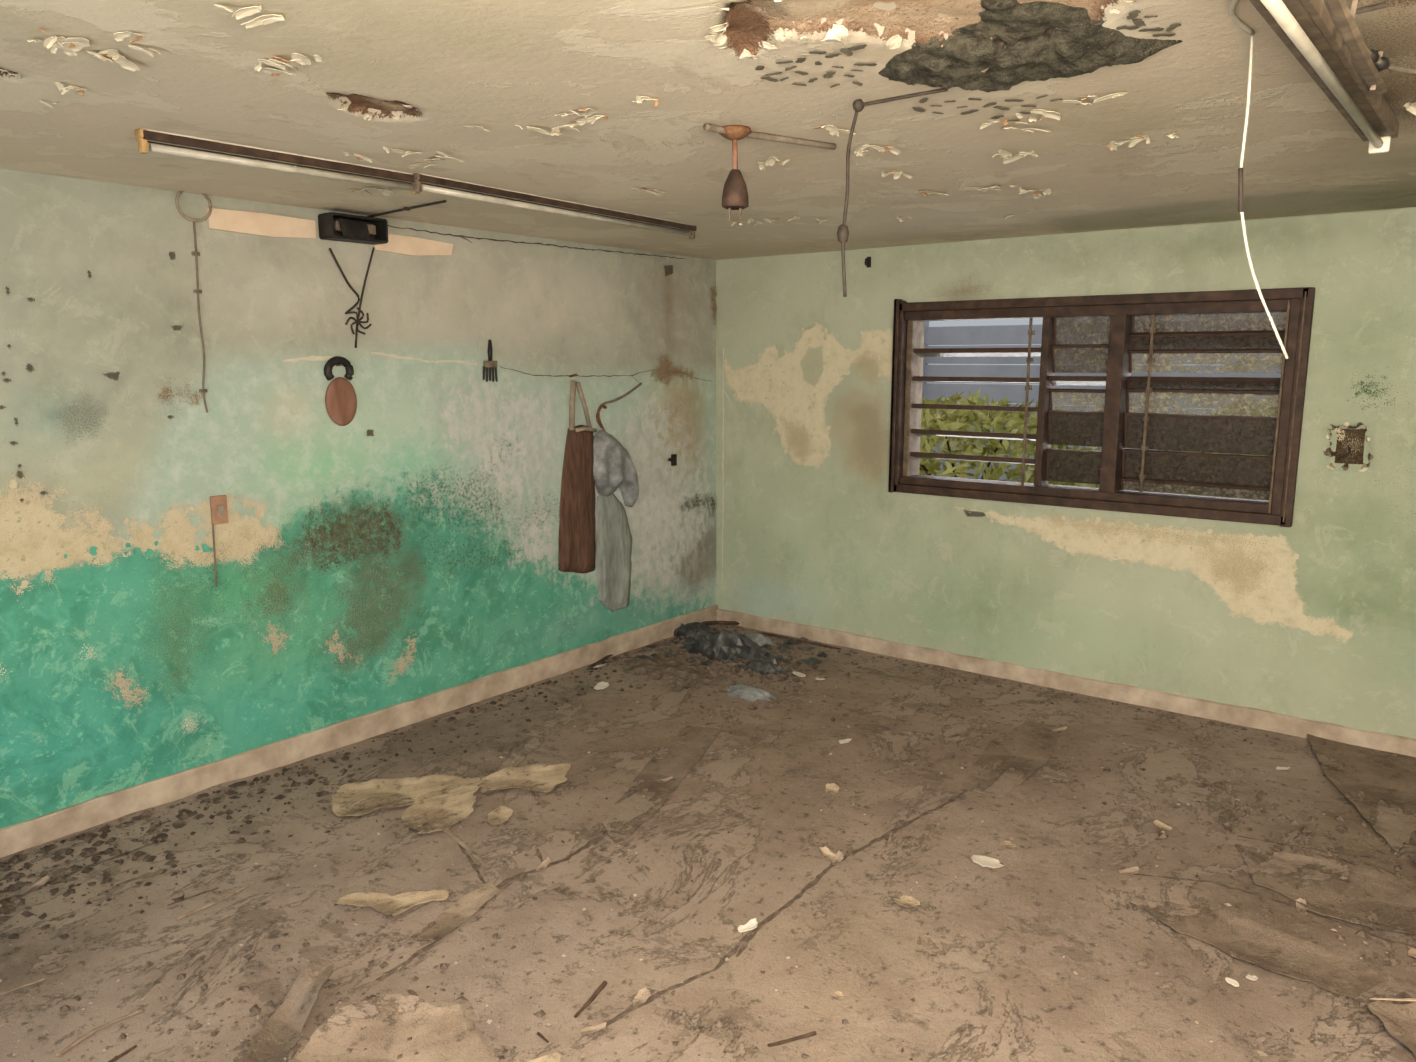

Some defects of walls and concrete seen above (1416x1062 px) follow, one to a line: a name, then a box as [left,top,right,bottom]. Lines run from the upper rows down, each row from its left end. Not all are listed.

spalling [326,92,422,121]
spalling [704,0,1137,61]
damp [1356,0,1416,134]
peeling [724,322,893,470]
damp [1347,367,1398,410]
peeling [0,464,289,601]
damp [127,368,568,713]
peeling [953,506,1353,644]